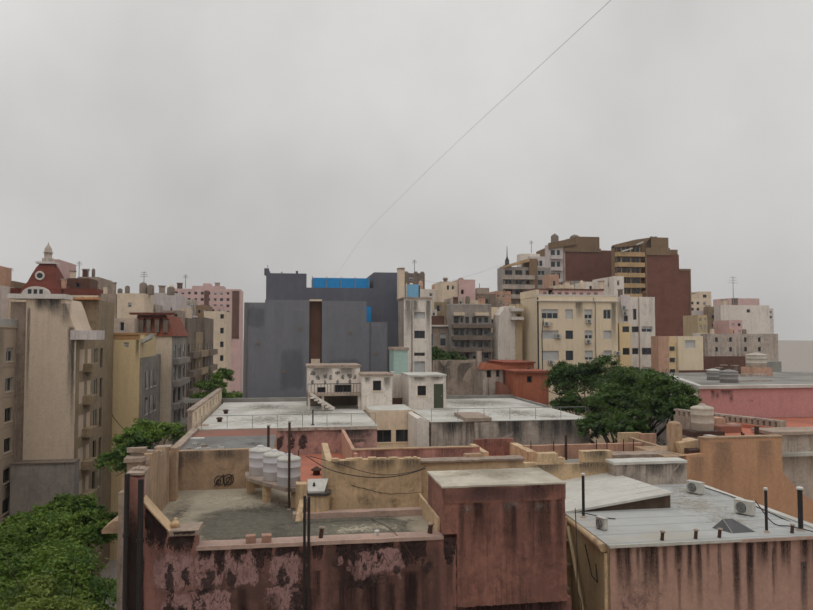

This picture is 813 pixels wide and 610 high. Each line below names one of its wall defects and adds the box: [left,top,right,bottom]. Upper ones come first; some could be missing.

peeling [150,546,307,610]
leakage [128,504,427,610]
leakage [443,537,456,572]
leakage [618,546,666,567]
leakage [733,541,787,590]
leakage [466,601,561,610]